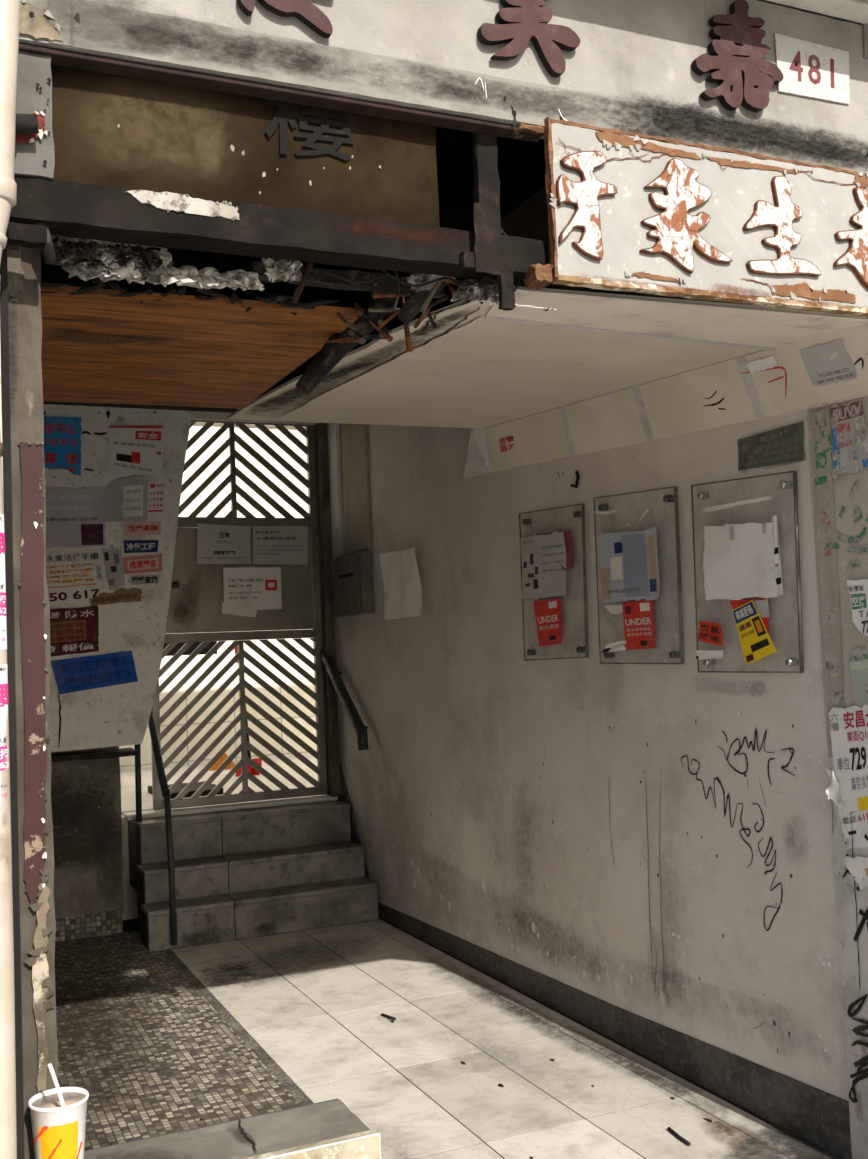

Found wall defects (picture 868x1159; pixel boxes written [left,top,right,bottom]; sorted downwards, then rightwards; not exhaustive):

spalling [19,0,63,42]
leakage [655,107,865,161]
spalling [51,235,303,291]
spalling [408,273,430,284]
crack [239,1119,257,1152]